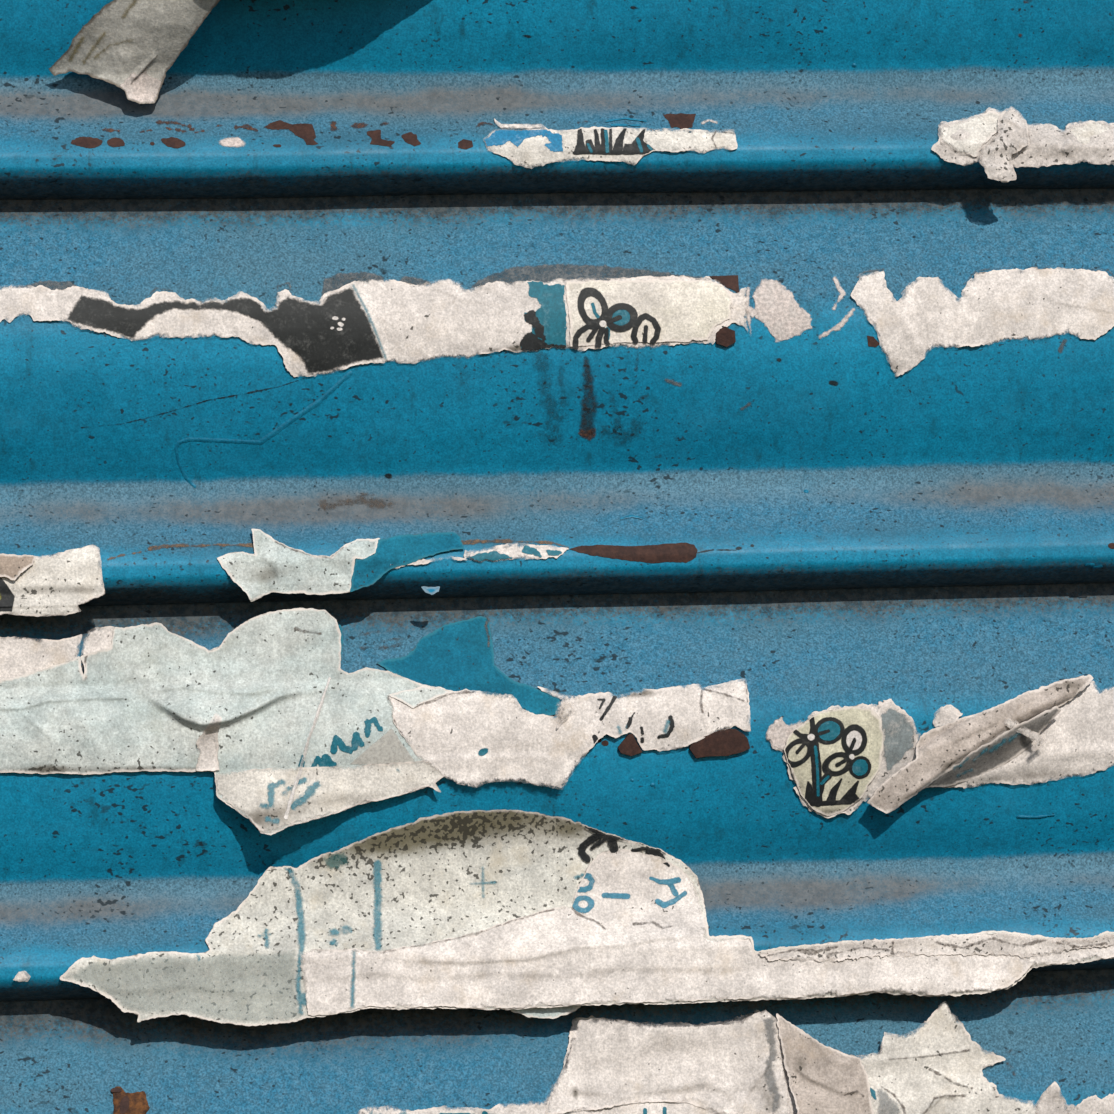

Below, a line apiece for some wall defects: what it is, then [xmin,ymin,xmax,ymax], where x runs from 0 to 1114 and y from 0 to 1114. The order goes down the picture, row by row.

peeling [605,117,647,126]
rust [663,113,696,129]
rust [71,128,125,148]
rust [140,120,318,148]
rust [352,122,421,147]
rust [570,543,698,563]
rust [597,734,642,756]
rust [689,728,750,758]
rust [111,1086,150,1114]